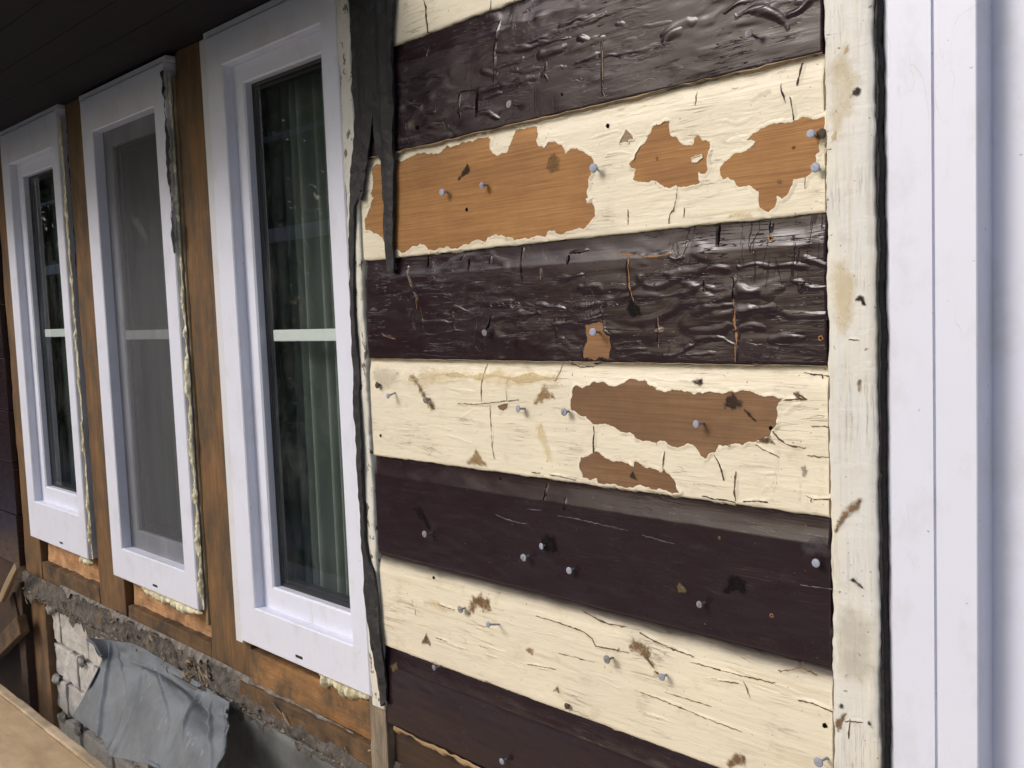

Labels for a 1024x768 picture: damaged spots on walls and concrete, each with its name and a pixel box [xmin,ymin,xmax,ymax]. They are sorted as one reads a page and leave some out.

crack [458,1,501,118]
peeling [363,123,598,258]
peeling [619,110,827,218]
crack [457,363,520,459]
crack [497,472,674,544]
peeling [580,319,614,365]
peeling [577,448,684,498]
peeling [568,375,785,463]
crack [702,455,768,506]
crack [756,426,830,458]
crack [784,369,829,401]
crack [527,608,863,739]